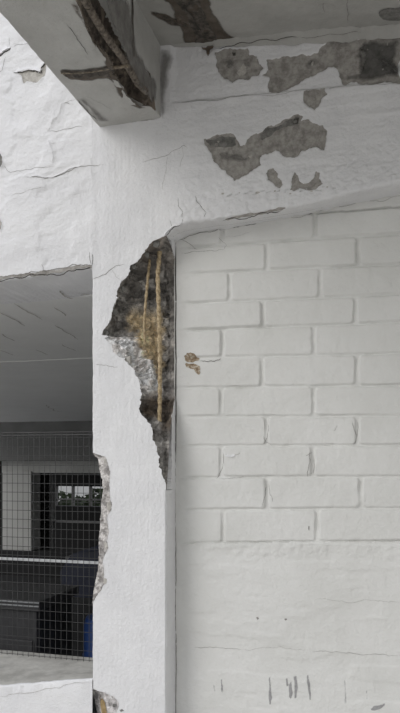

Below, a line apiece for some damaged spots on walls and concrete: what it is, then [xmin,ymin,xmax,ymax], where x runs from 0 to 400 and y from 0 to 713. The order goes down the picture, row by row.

spalling [152,12,190,27]
crack [0,44,20,72]
peeling [13,61,46,85]
spalling [61,0,156,110]
peeling [215,38,400,93]
peeling [303,88,327,110]
crack [5,98,108,194]
peeling [204,114,327,181]
spalling [101,236,175,489]
spalling [92,453,112,604]
spalling [93,689,124,713]